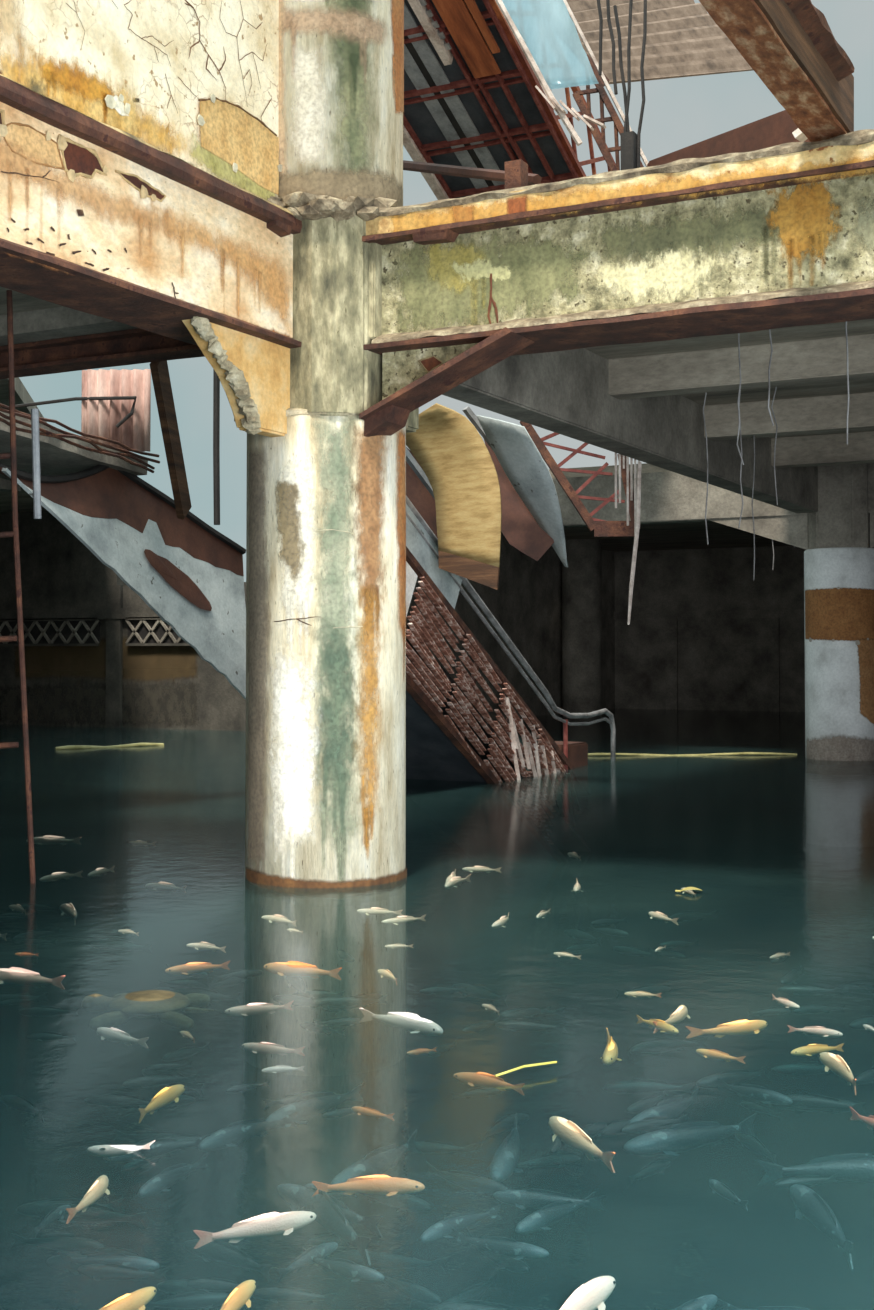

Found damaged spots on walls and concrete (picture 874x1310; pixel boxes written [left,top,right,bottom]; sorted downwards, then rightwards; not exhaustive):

peeling [0,109,166,202]
peeling [105,94,130,116]
crack [112,0,272,121]
damp [0,0,403,207]
peeling [197,93,282,195]
damp [395,232,590,333]
damp [592,207,780,279]
rust [356,430,406,851]